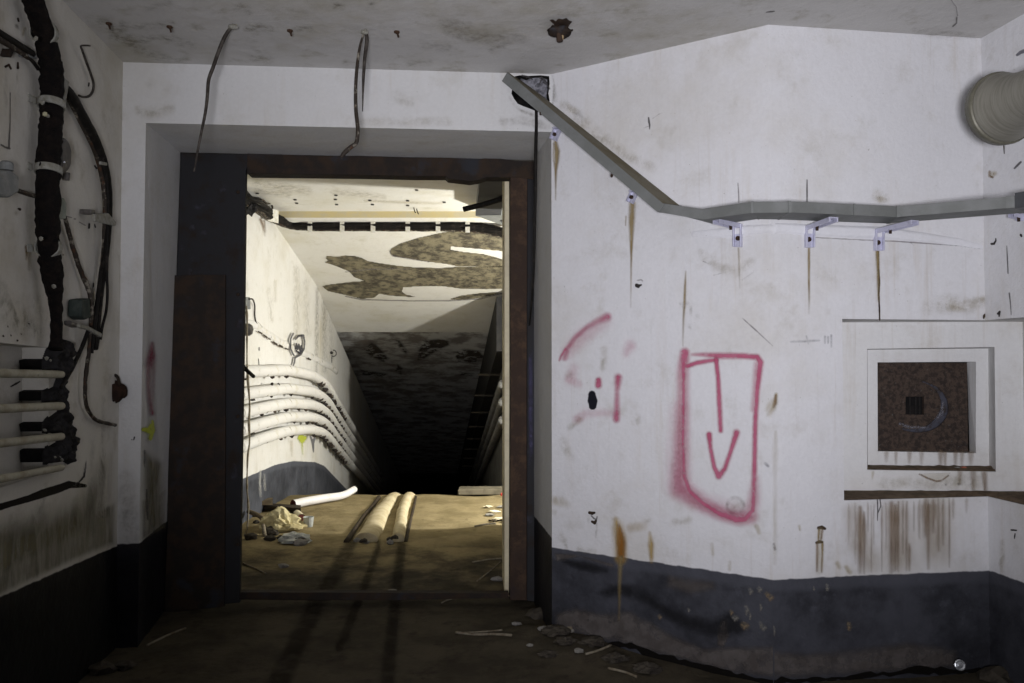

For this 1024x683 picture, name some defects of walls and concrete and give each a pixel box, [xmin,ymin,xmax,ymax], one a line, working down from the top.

spalling [550,18,573,31]
spalling [511,75,550,111]
peeling [323,232,502,300]
rust [615,521,625,573]
rust [815,525,826,565]